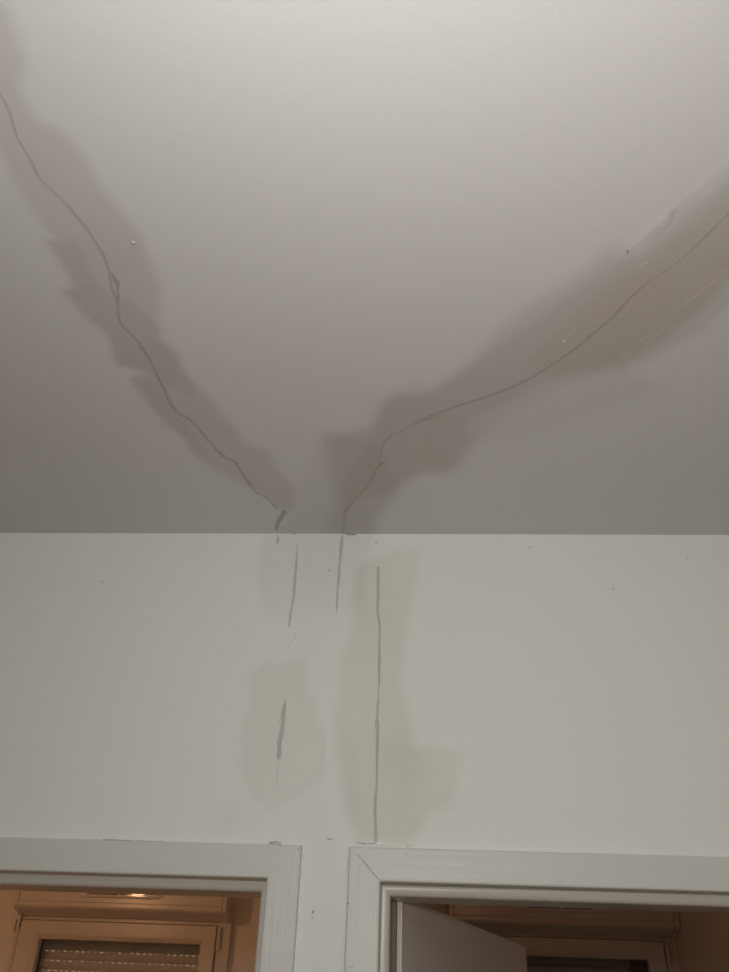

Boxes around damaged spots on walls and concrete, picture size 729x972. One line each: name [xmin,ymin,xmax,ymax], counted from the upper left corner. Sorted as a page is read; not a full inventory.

crack [0,92,298,648]
crack [275,697,286,788]
damp [0,0,729,534]
crack [355,566,381,881]
damp [202,215,729,848]
crack [336,212,729,612]